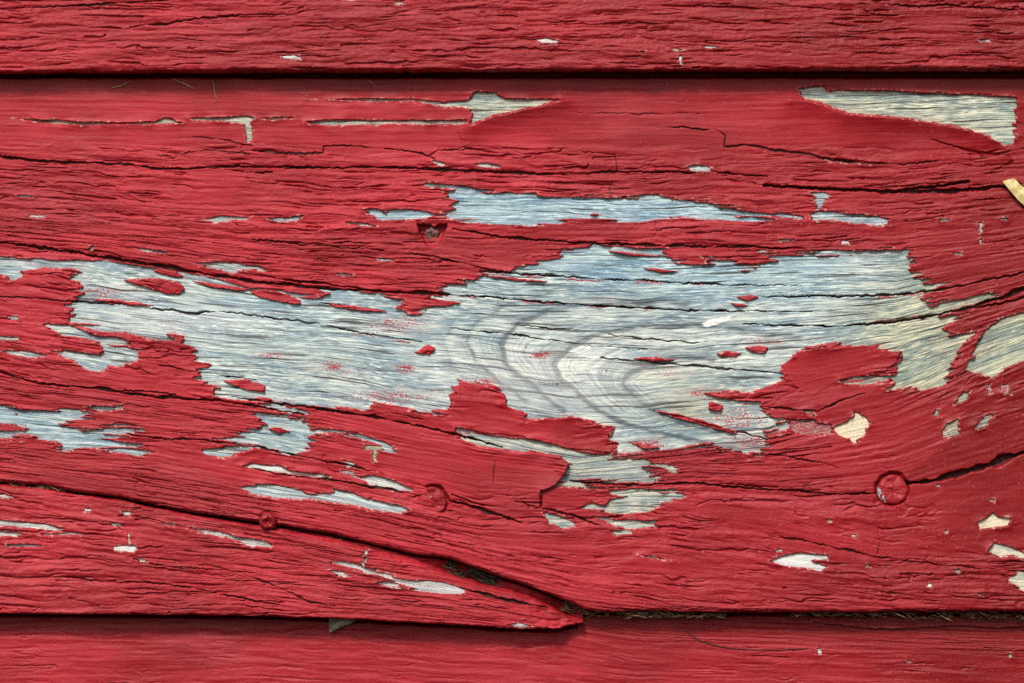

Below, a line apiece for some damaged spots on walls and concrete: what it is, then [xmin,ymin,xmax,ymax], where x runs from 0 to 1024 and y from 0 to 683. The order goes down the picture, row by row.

peeling [756,86,1017,175]
crack [0,112,1021,197]
peeling [349,184,888,226]
crack [452,224,833,251]
peeling [0,239,1024,535]
crack [905,451,1024,485]
crack [449,494,601,526]
crack [65,558,333,607]
peeling [331,549,465,594]
crack [460,587,548,608]
peeling [771,550,829,571]
peeling [988,543,1024,591]